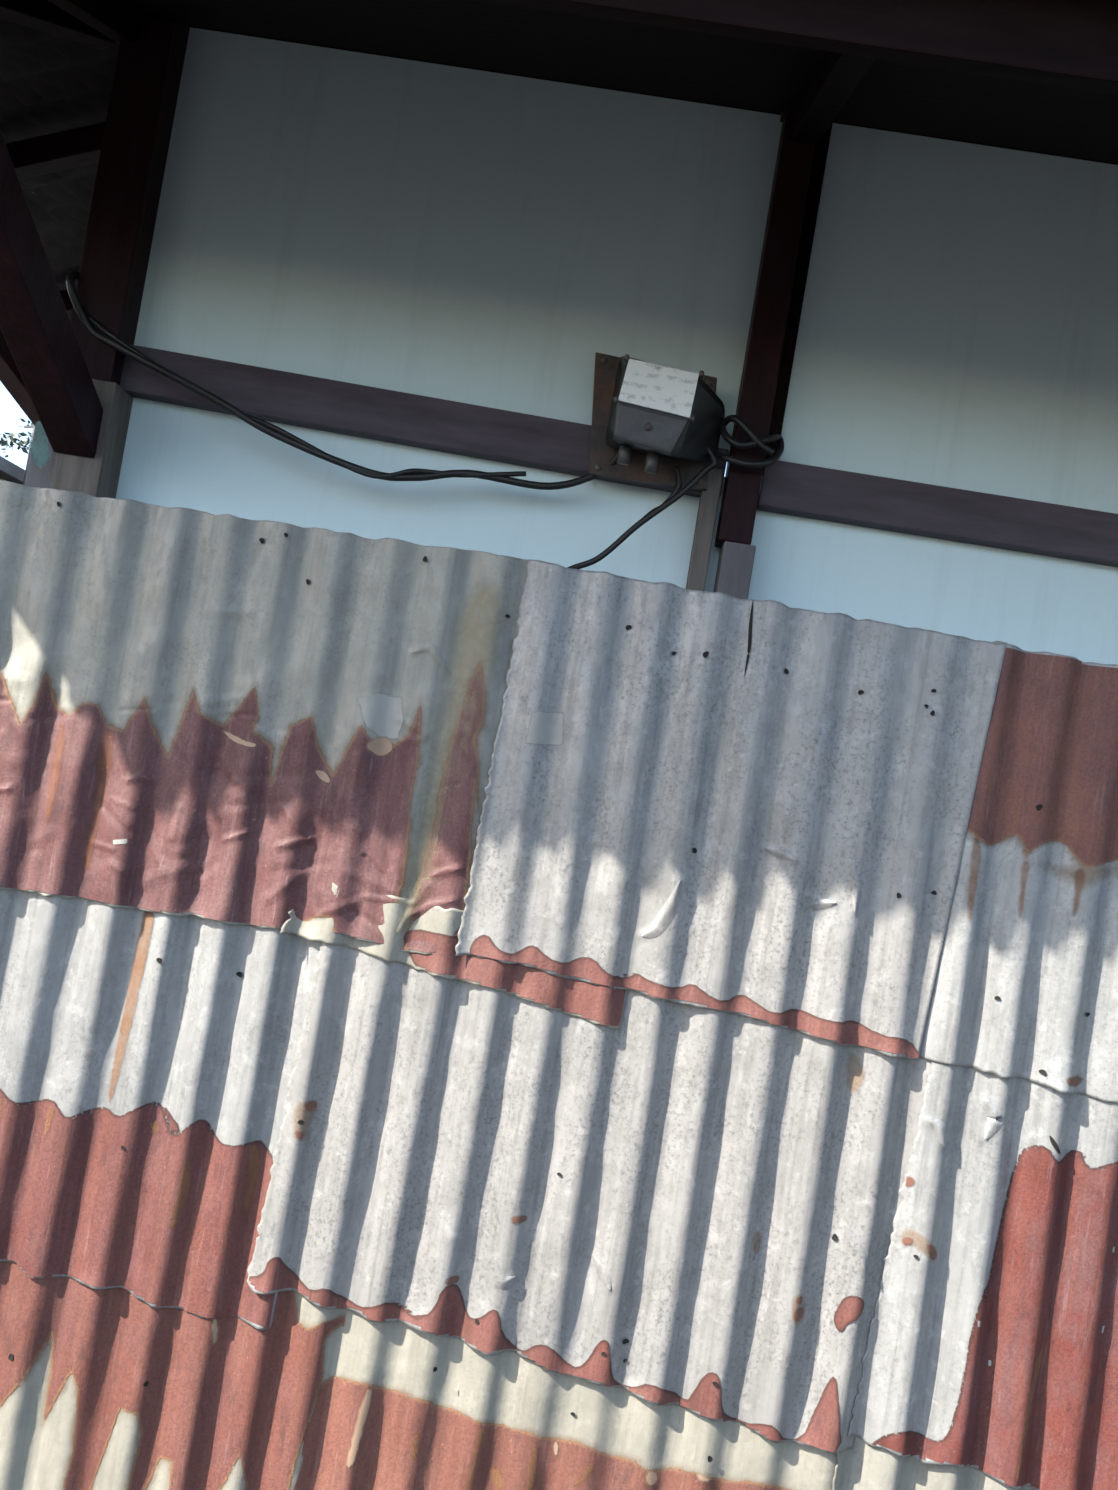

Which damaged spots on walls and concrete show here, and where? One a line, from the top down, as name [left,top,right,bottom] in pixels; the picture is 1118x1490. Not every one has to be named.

corrosion [109,911,153,1101]
peeling [0,664,919,1058]
corrosion [1074,870,1089,913]
peeling [0,1090,841,1490]
peeling [872,1145,1118,1490]